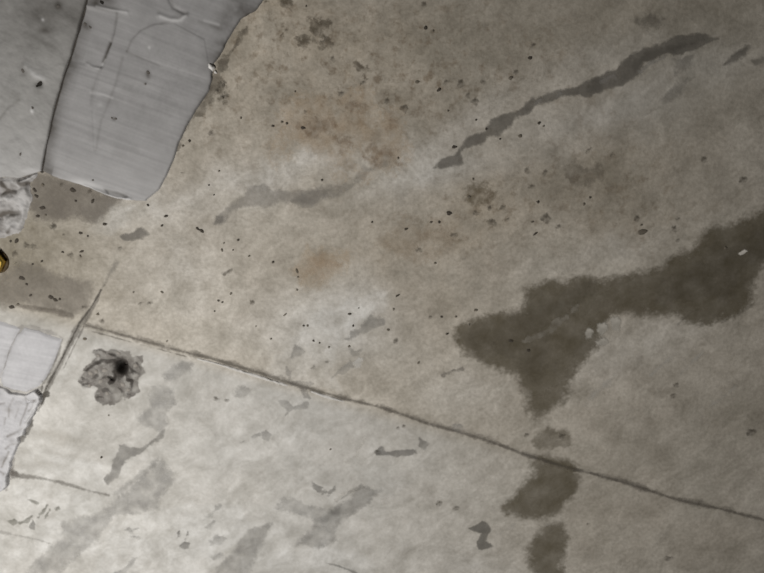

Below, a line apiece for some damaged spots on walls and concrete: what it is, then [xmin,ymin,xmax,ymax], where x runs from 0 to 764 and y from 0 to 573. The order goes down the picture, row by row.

water stain [562,52,650,97]
water stain [465,115,512,144]
peeling [0,173,38,238]
water stain [457,214,764,409]
crack [41,290,101,404]
spalling [79,349,143,405]
crack [197,358,288,386]
peeling [0,386,43,492]
water stain [506,461,577,518]